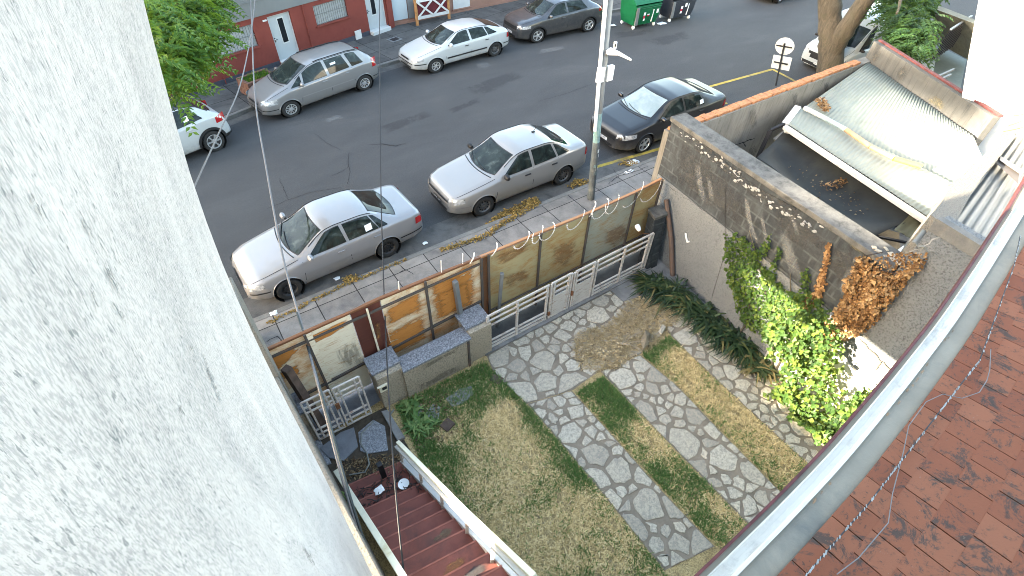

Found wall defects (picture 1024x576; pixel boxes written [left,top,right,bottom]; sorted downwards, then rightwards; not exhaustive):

rust [433,265,474,318]
rust [387,294,426,353]